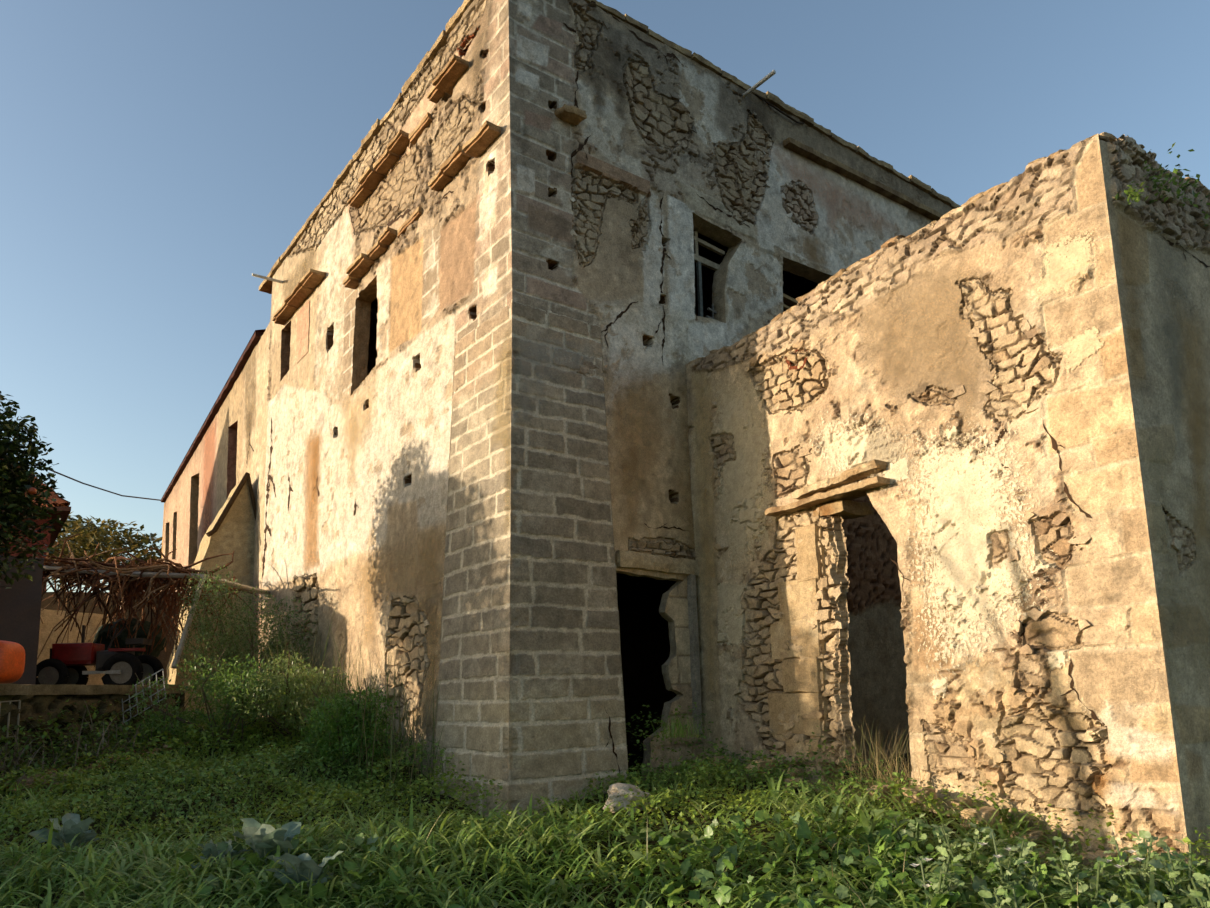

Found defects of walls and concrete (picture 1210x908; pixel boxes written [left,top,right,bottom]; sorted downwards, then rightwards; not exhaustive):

flaking render [572,7,609,71]
flaking render [289,0,489,256]
flaking render [548,168,653,268]
flaking render [622,60,697,150]
flaking render [713,111,819,235]
flaking render [1037,227,1100,303]
flaking render [708,279,1114,817]
crack [981,421,1014,477]
crack [1040,416,1092,562]
flaking render [383,596,431,721]